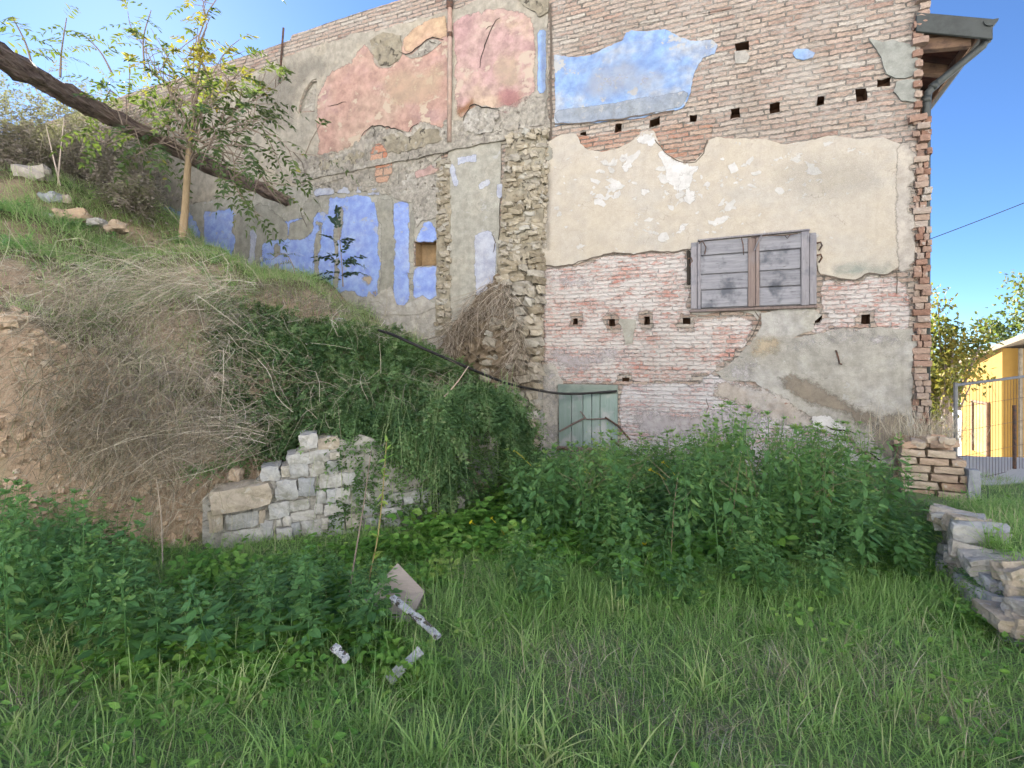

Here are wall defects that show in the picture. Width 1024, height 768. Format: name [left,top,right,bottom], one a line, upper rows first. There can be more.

spalling [370,32,442,66]
peeling [893,79,916,103]
spalling [463,101,546,135]
spalling [363,276,435,315]
spalling [543,123,876,476]
spalling [812,276,911,333]